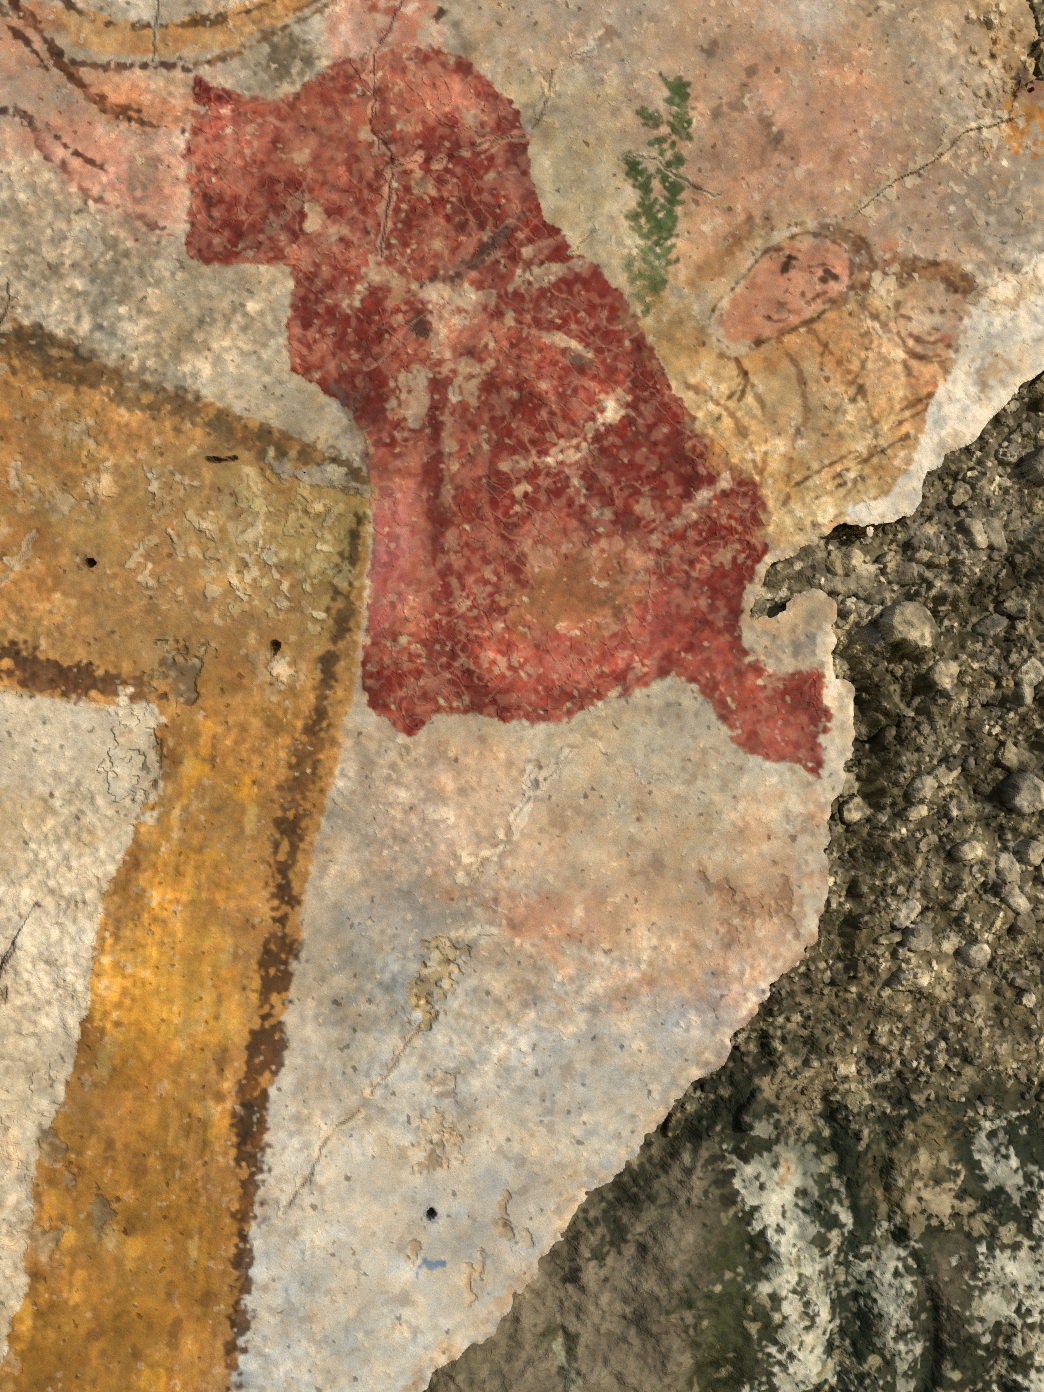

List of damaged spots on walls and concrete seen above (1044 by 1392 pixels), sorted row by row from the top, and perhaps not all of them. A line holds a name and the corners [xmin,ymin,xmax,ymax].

peeling [359,126,375,143]
crack [863,119,1013,210]
peeling [303,203,350,244]
crack [0,280,11,323]
peeling [361,246,595,489]
peeling [499,388,633,512]
peeling [681,471,734,524]
spalling [806,522,883,546]
peeling [501,526,651,649]
flaking render [696,861,814,960]
flaking render [412,1069,465,1176]
flaking render [493,1190,565,1249]